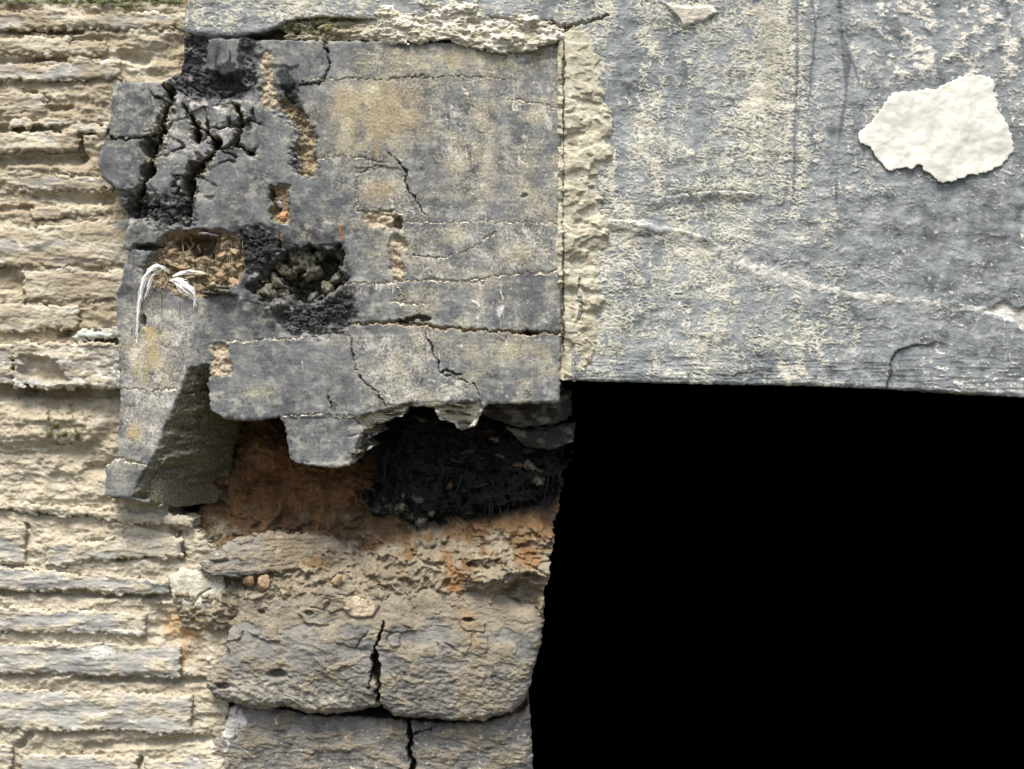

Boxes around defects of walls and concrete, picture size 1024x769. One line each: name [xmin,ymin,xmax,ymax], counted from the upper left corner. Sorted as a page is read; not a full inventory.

crack [108,83,255,219]
flaking render [858,75,1014,183]
crack [227,15,609,406]
spalling [141,229,348,312]
spalling [350,407,409,455]
spalling [438,402,481,429]
crack [367,622,437,769]